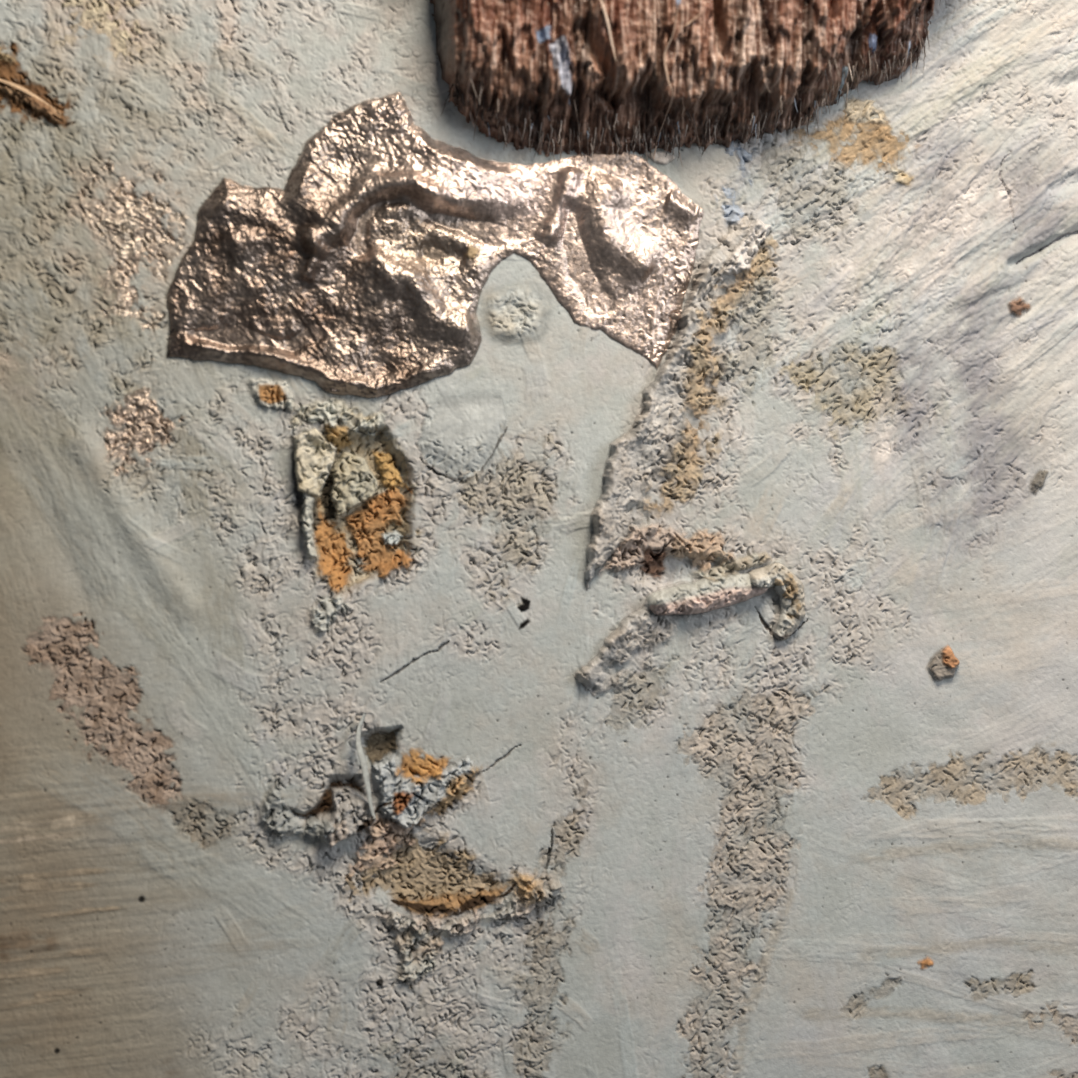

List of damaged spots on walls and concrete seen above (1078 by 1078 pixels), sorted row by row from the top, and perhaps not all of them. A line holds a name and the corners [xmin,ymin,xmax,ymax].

spalling [0,43,72,127]
spalling [250,379,420,632]
peeling [600,524,806,640]
peeling [24,613,236,848]
peeling [261,782,425,878]
peeling [868,747,1078,819]
peeling [676,686,826,1078]
peeling [964,971,1034,999]
peeling [1024,1005,1078,1044]